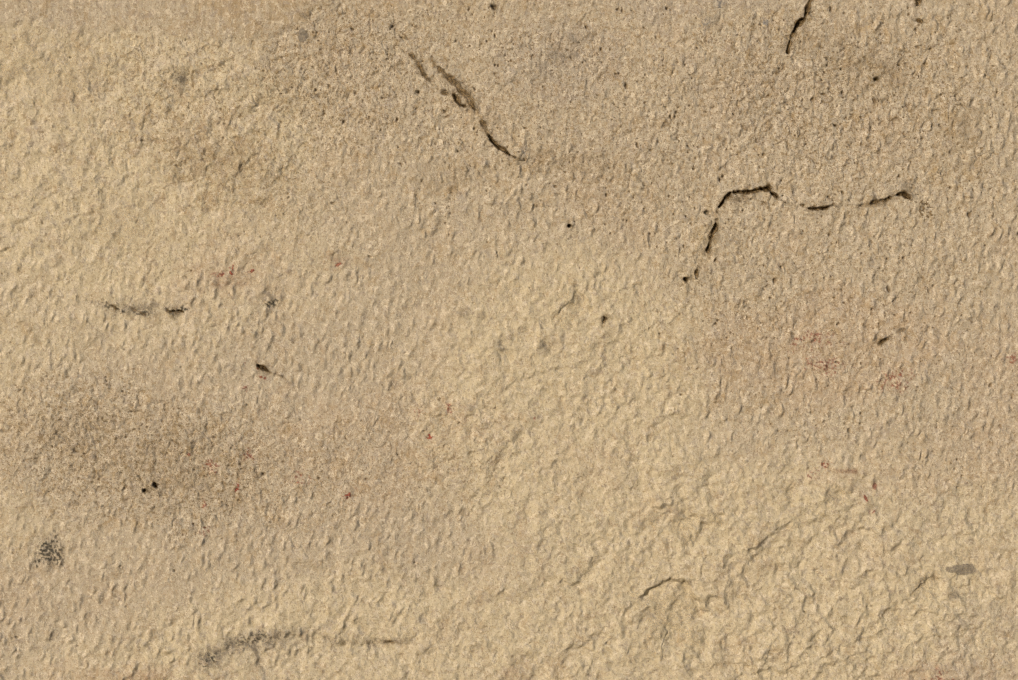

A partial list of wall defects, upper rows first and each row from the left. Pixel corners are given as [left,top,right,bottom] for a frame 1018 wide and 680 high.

crack [786,0,813,54]
crack [915,0,923,23]
crack [409,54,514,157]
crack [694,184,778,276]
crack [802,203,829,211]
crack [870,190,911,204]